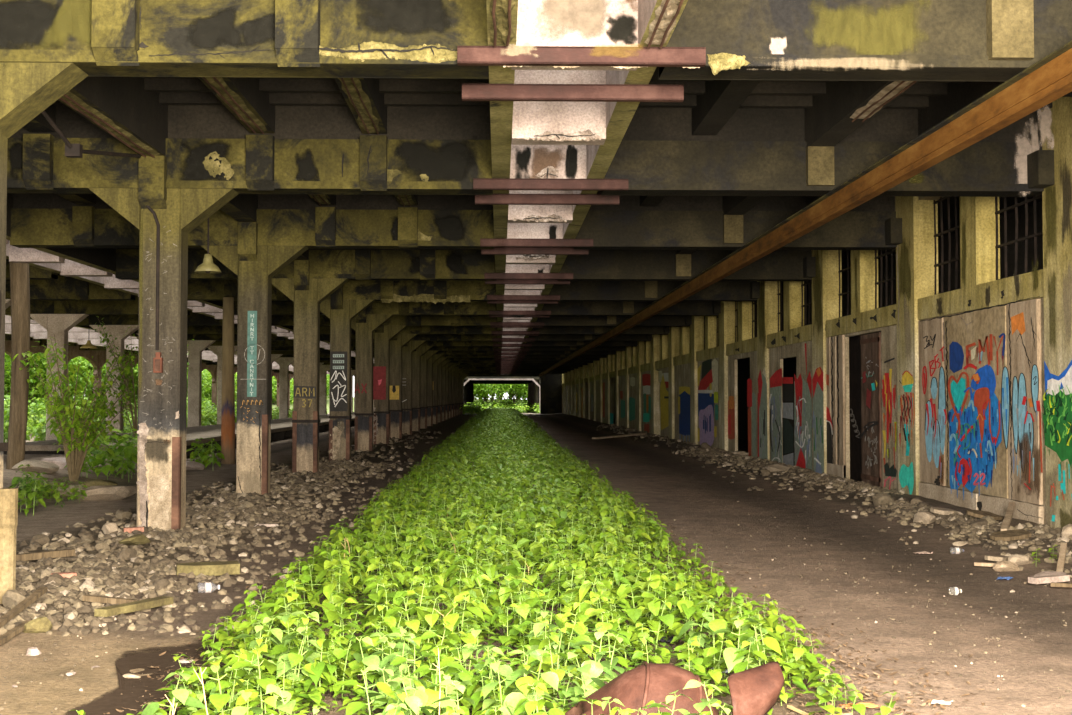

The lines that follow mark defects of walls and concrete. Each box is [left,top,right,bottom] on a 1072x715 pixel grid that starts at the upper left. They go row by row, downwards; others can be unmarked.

spalling [319,41,457,63]
spalling [683,52,751,75]
peeling [203,151,234,181]
damp [516,145,577,179]